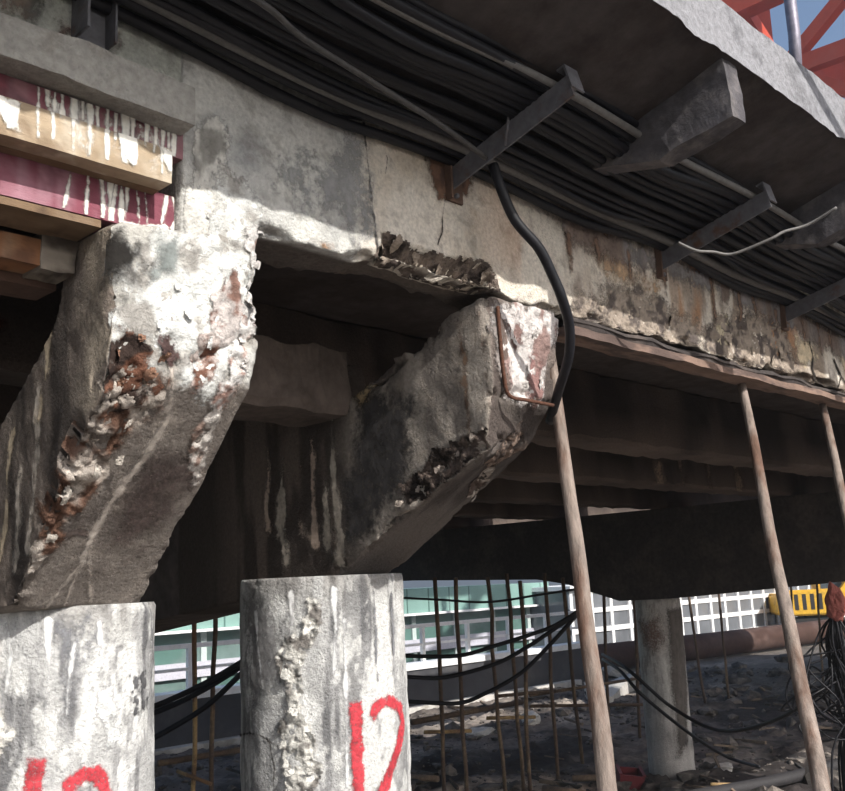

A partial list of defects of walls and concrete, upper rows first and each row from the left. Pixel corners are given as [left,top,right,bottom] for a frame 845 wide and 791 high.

crack [363,122,387,249]
spalling [370,231,501,295]
peeling [27,115,271,574]
rust [210,269,248,348]
rust [485,312,523,395]
peeling [490,296,558,409]
rust [527,353,544,400]
crack [809,341,817,383]
water stain [0,331,53,573]
water stain [300,438,346,568]
water stain [130,670,149,716]
crack [240,732,278,780]